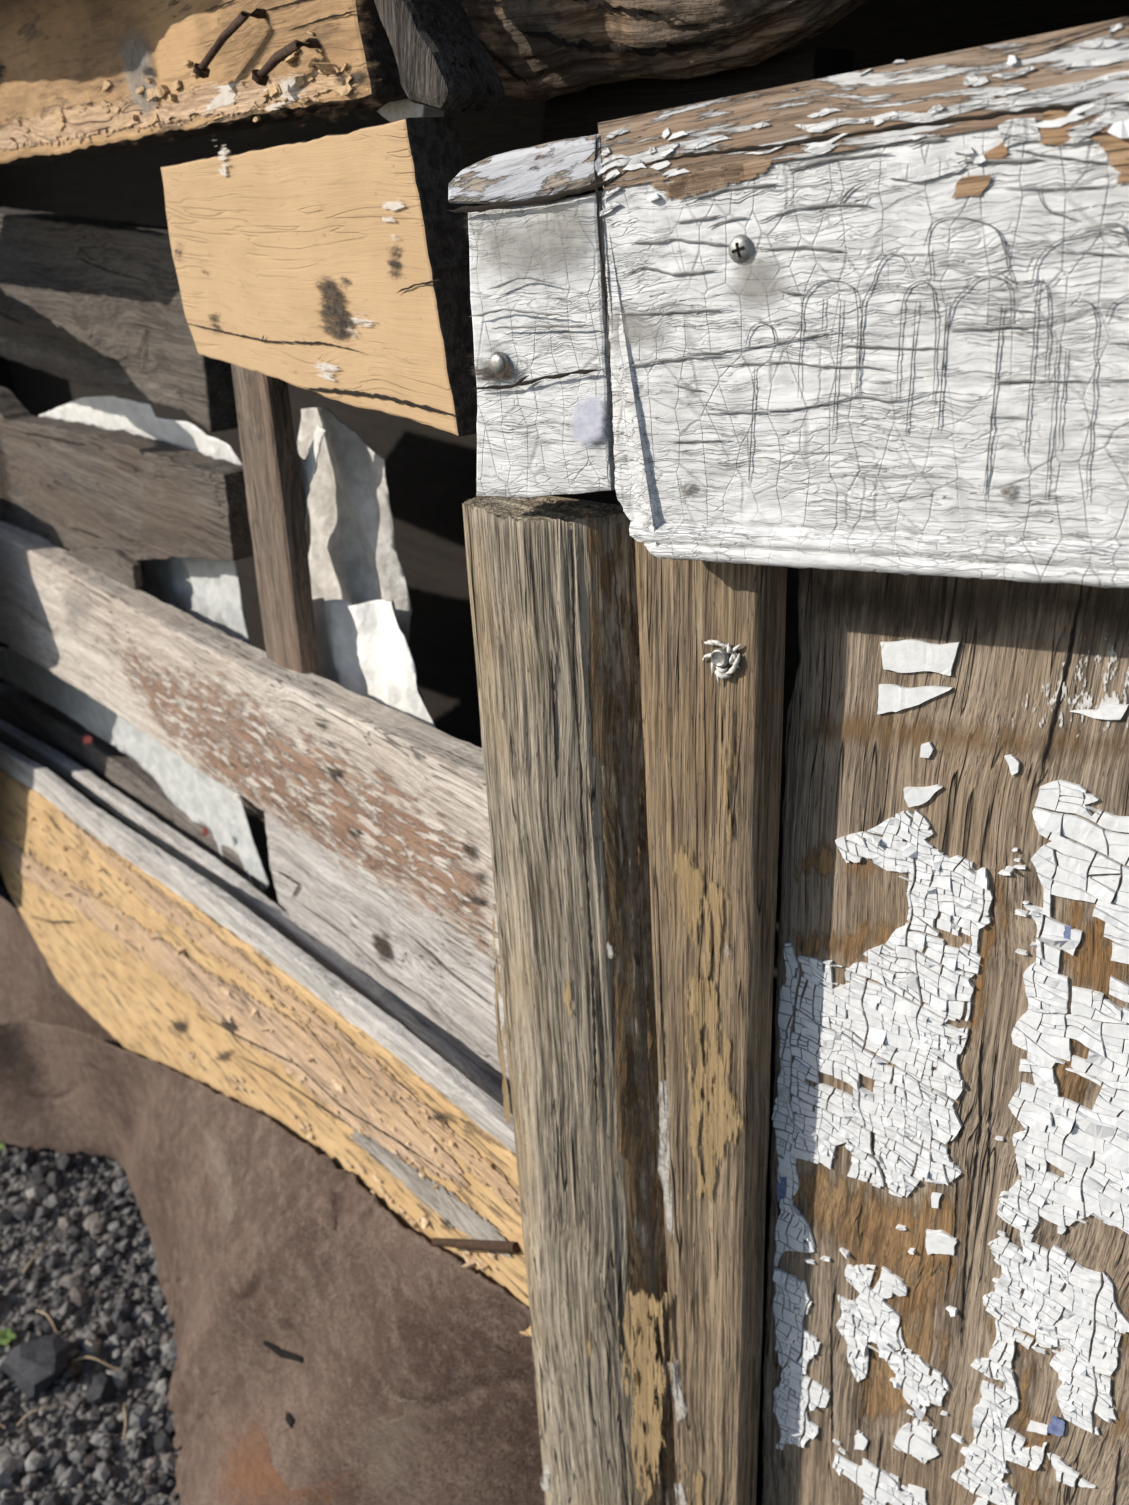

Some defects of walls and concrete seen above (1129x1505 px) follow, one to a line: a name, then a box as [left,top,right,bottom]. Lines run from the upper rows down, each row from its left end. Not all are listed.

peeling [596,17,1129,216]
crack [183,322,364,353]
crack [306,101,1129,500]
peeling [877,639,960,714]
peeling [920,741,934,758]
peeling [1004,754,1020,775]
crack [1040,585,1083,778]
peeling [1070,701,1129,720]
rust [0,896,545,1505]
peeling [772,780,1129,1505]